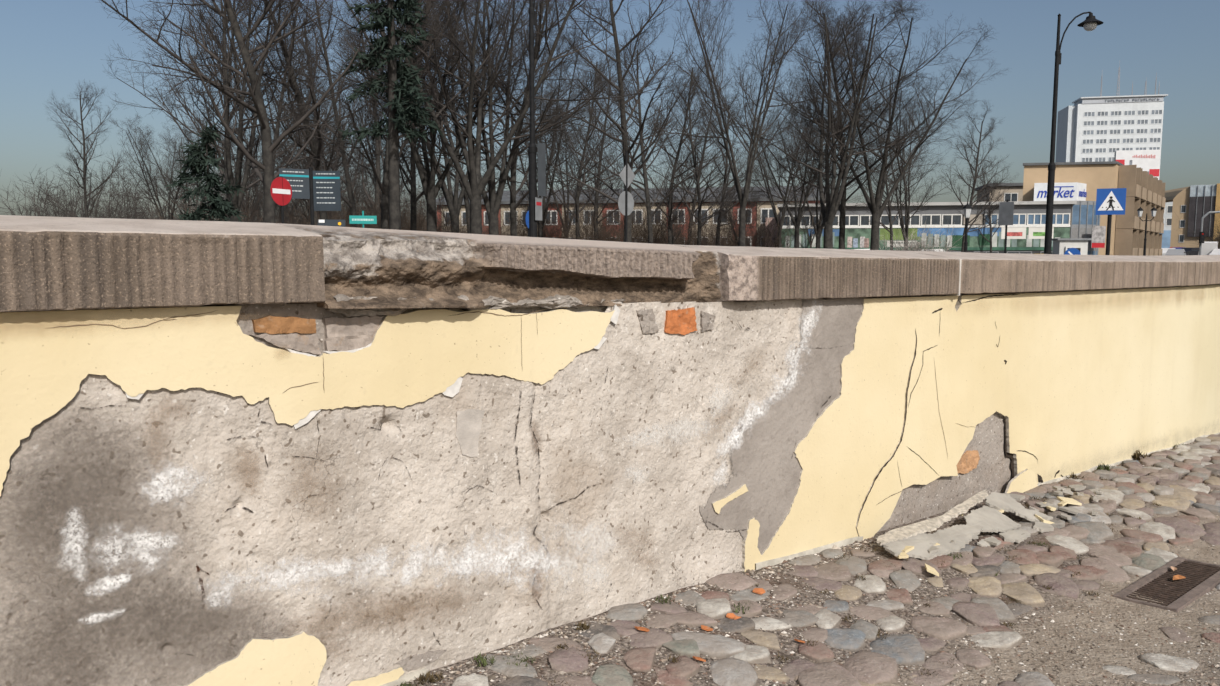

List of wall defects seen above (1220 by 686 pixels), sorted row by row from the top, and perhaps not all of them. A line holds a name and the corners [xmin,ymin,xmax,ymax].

crack [52,310,218,329]
spalling [0,223,868,686]
crack [857,294,1018,526]
spalling [878,413,1038,532]